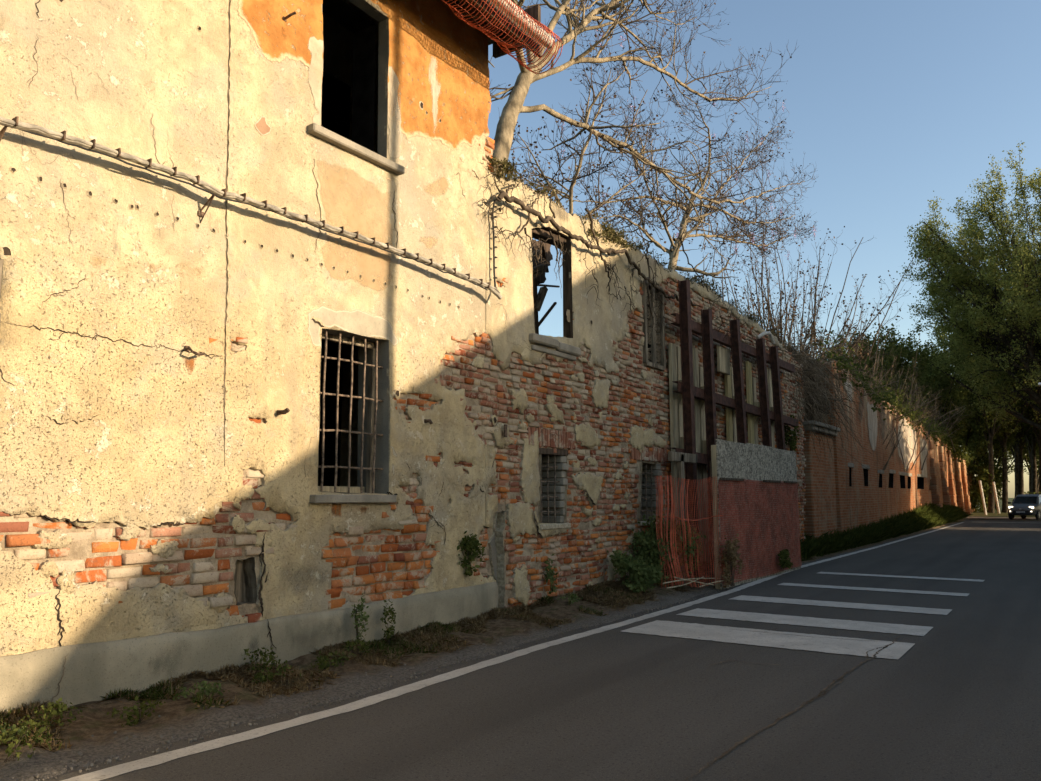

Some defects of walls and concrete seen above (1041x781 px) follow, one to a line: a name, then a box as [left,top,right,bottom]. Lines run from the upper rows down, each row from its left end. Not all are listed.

peeling [255,116,271,136]
peeling [238,0,324,125]
peeling [371,0,495,172]
crack [5,0,244,466]
spalling [393,277,806,608]
crack [51,589,70,702]
spalling [0,468,297,623]
crack [258,532,276,664]
spalling [321,473,440,609]